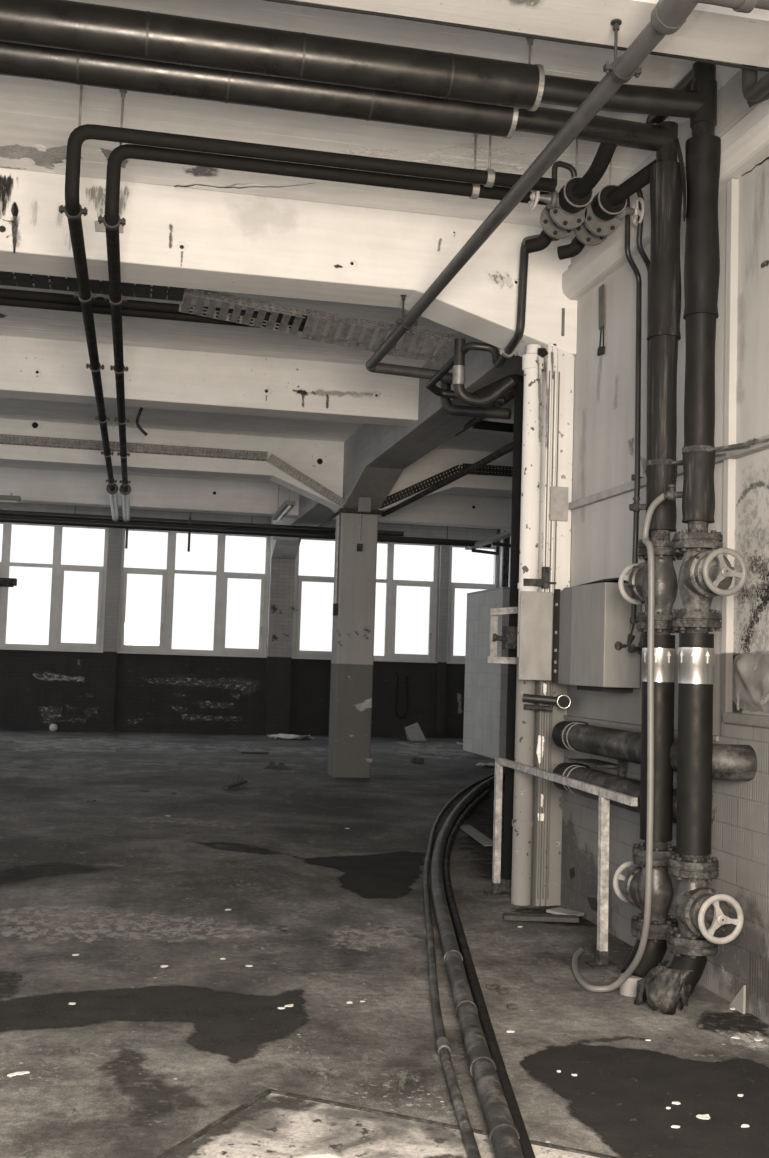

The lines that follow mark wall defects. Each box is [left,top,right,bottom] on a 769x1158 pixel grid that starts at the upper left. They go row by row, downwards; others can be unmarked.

peeling [0,145,67,169]
damp [0,175,13,216]
damp [733,550,769,663]
damp [0,863,94,885]
damp [199,842,426,899]
damp [0,972,308,1063]
damp [520,1037,769,1158]